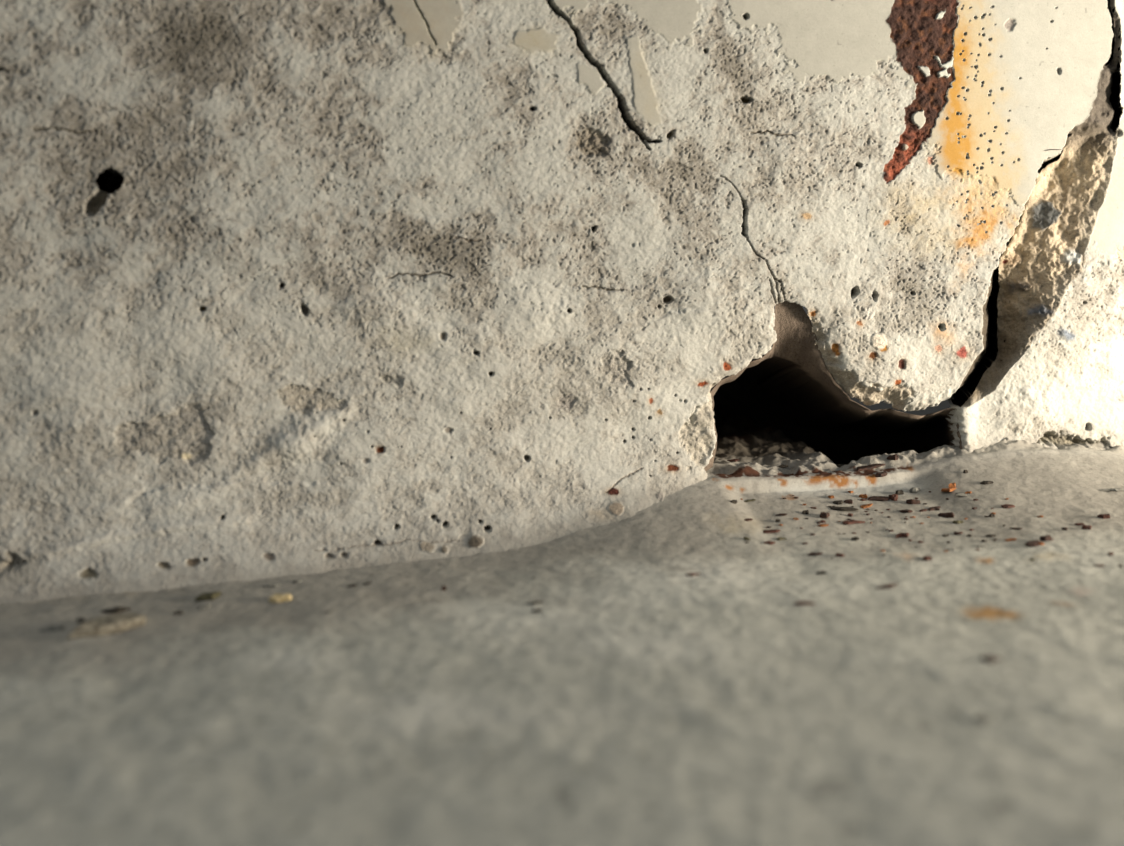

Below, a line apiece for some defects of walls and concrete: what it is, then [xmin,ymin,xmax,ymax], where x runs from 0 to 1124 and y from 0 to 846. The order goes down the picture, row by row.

crack [414,0,437,45]
crack [546,0,662,150]
crack [1046,0,1124,164]
corrosion [867,0,1034,301]
crack [720,174,787,303]
spalling [800,305,922,411]
corrosion [924,314,969,360]
corrosion [710,454,954,545]
corrosion [1005,514,1110,547]